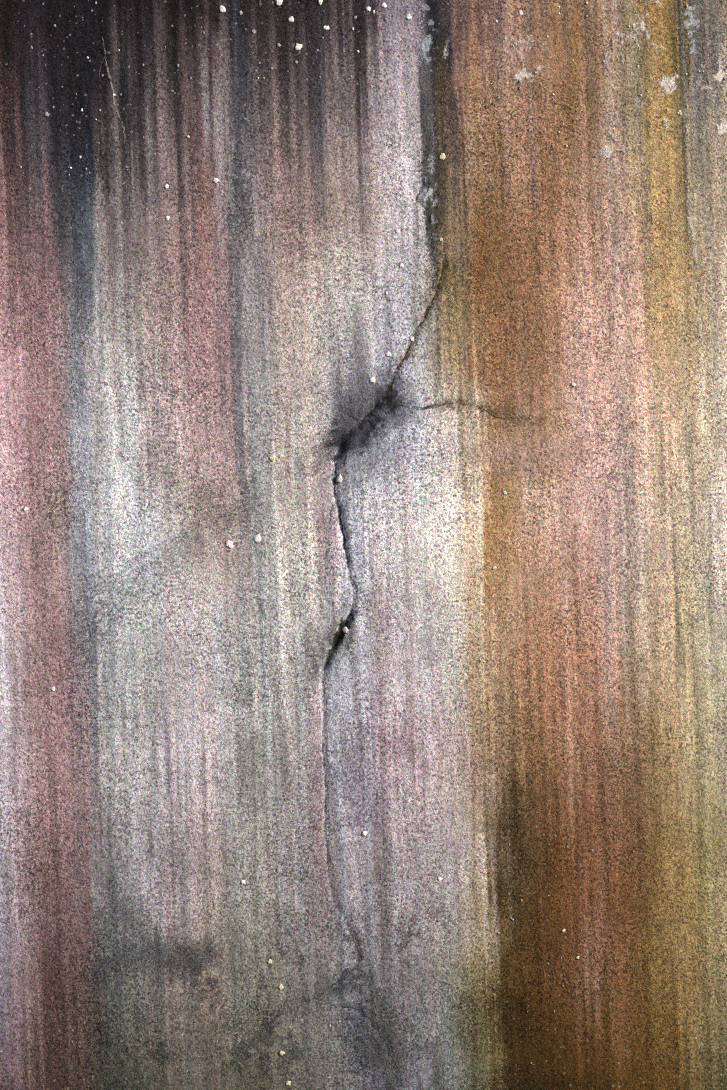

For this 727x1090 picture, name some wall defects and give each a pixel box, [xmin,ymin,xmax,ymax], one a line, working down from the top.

damp [0,0,362,825]
crack [323,156,527,962]
damp [397,0,469,410]
rust [483,471,510,624]
rust [457,14,604,435]
rust [478,540,693,1090]